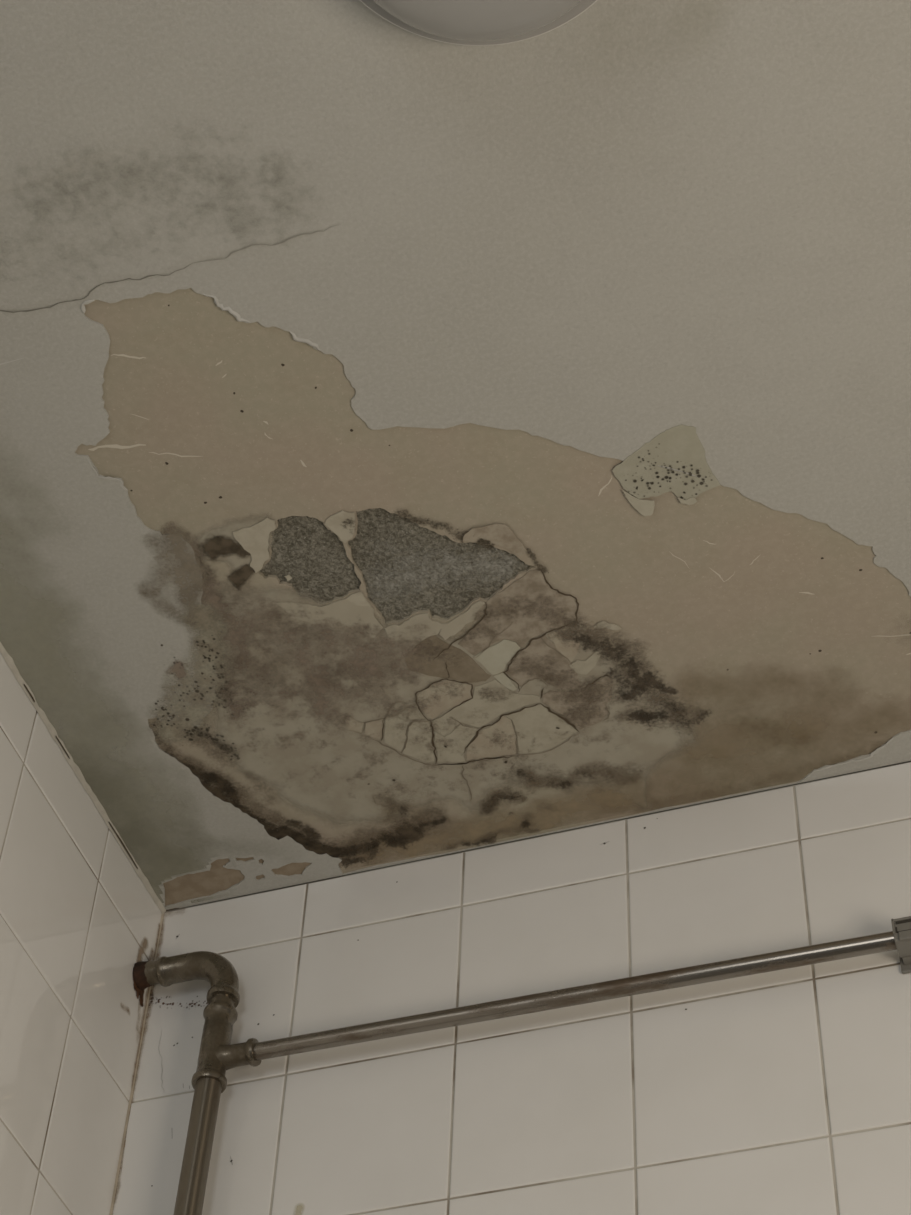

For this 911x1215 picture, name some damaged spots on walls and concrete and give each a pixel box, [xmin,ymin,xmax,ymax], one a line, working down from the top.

water stain [397,510,494,549]
peeling [75,288,911,873]
water stain [142,524,641,866]
crack [342,573,612,801]
water stain [470,599,708,729]
peeling [163,857,311,906]
rust [127,924,208,1036]